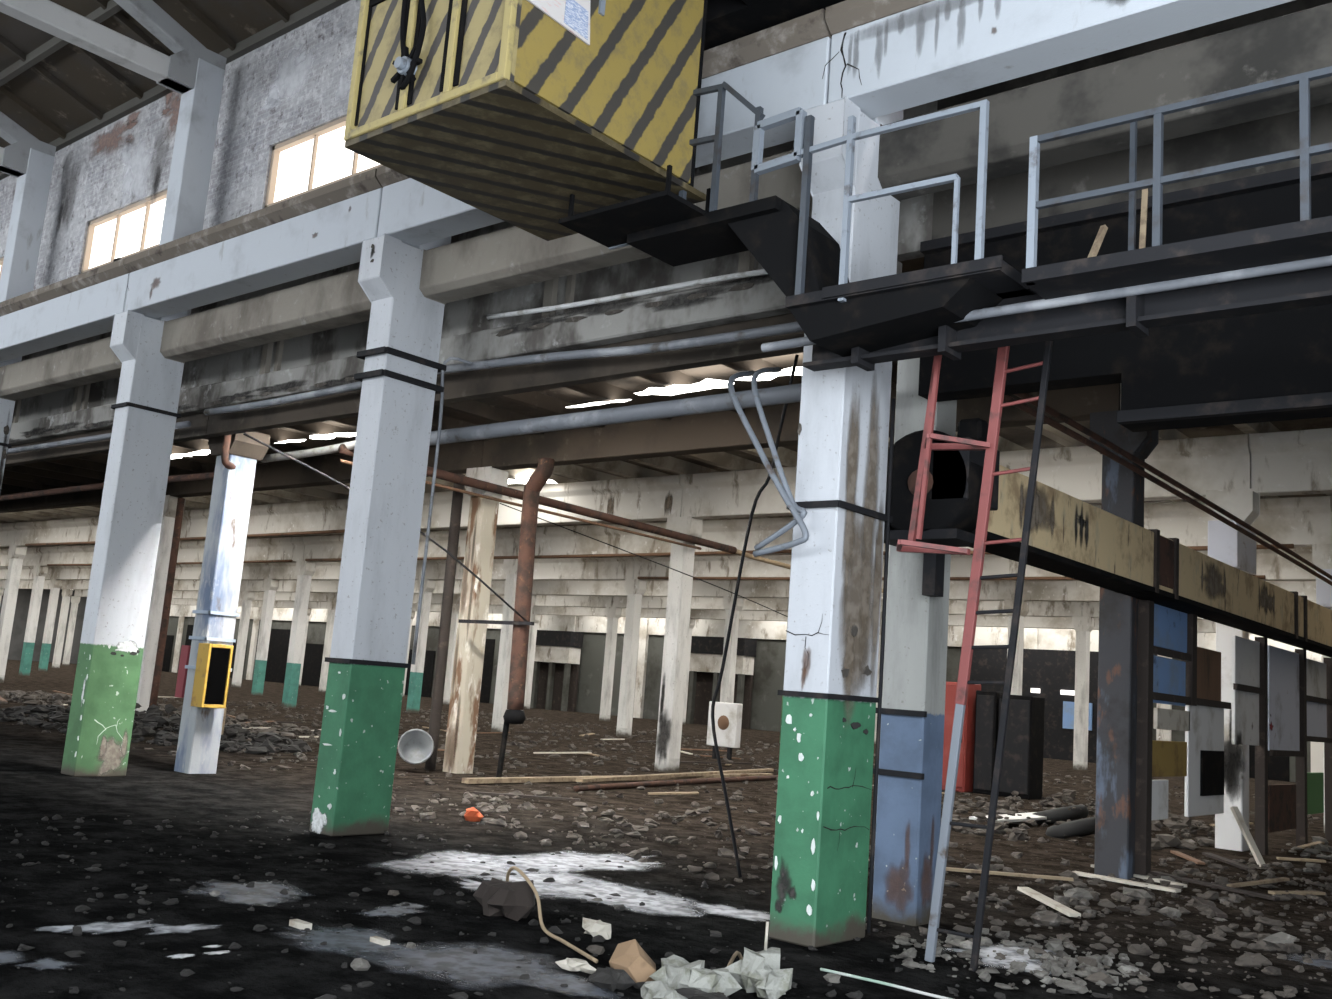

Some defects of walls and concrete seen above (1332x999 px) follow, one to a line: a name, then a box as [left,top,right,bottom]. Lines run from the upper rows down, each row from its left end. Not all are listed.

peeling [108,641,140,657]
peeling [786,714,804,761]
rust [888,822,934,906]